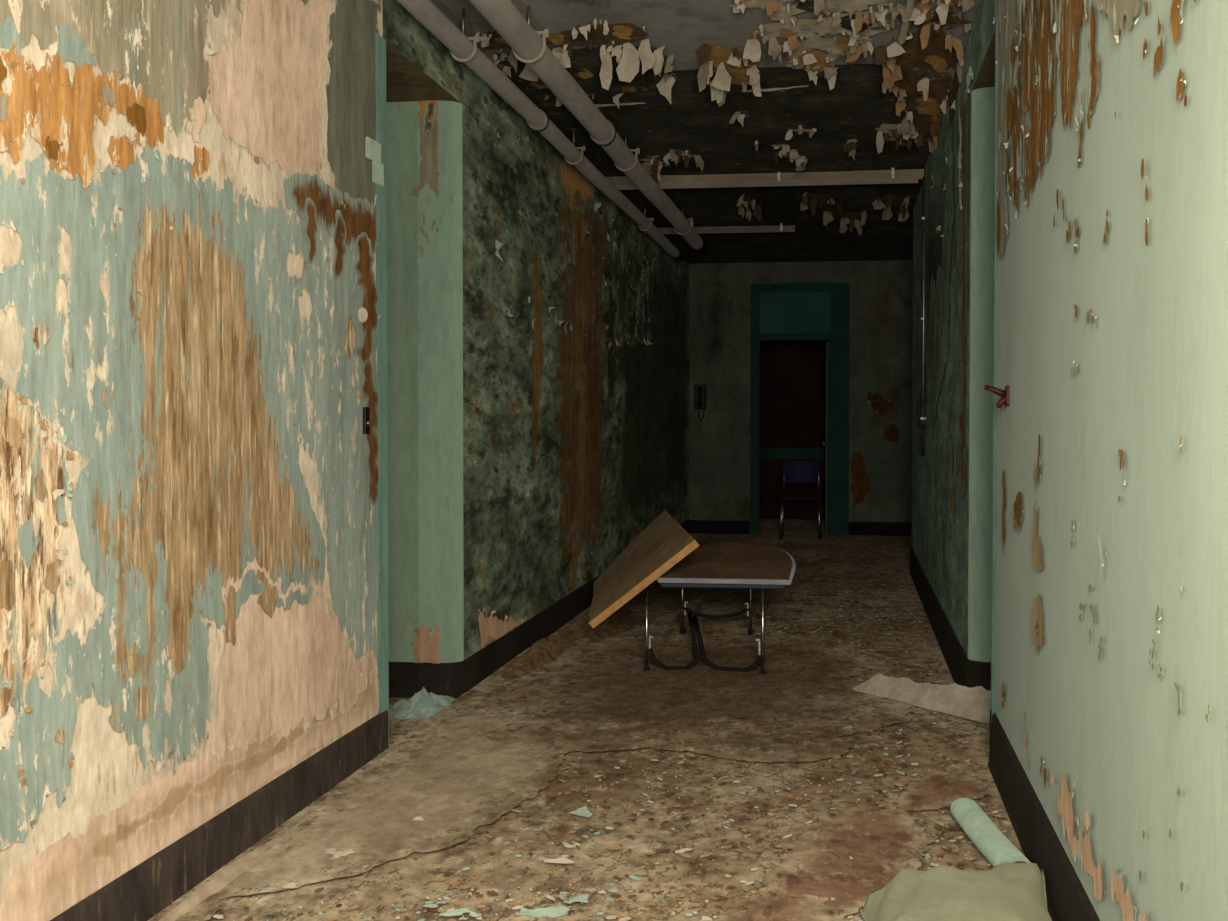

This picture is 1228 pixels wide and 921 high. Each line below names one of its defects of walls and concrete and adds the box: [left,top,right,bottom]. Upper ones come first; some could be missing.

peeling [475,30,562,106]
water stain [519,87,625,175]
peeling [493,95,656,350]
peeling [538,0,675,108]
water stain [580,67,954,427]
peeling [695,0,974,210]
peeling [993,0,1196,288]
peeling [0,0,382,851]
water stain [72,172,326,726]
peeling [1001,434,1043,571]
spalling [411,621,440,664]
spalling [1021,712,1148,921]